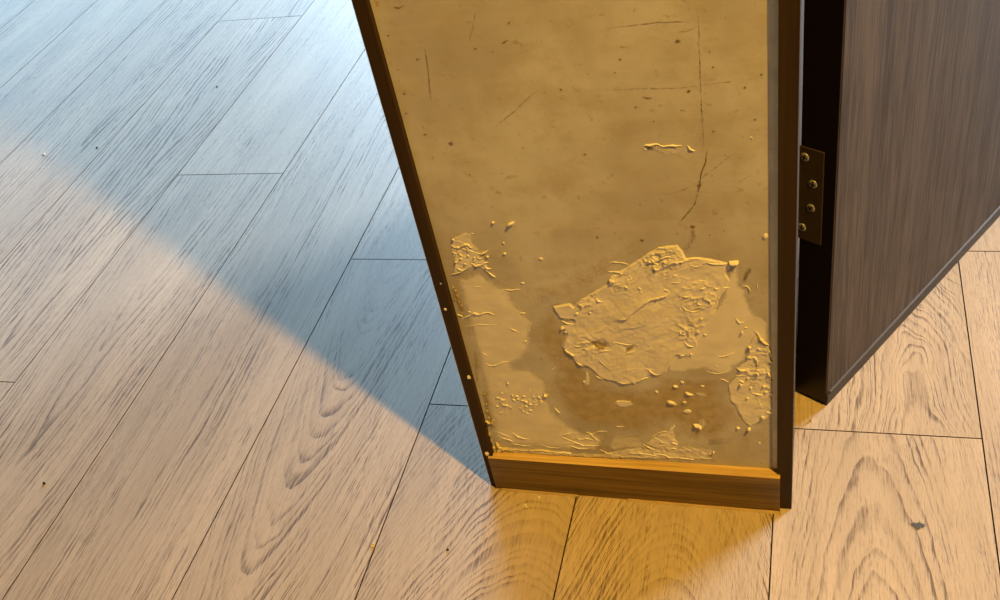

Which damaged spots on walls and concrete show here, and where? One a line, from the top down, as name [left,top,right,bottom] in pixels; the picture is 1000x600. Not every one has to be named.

crack [614,15,712,221]
peeling [643,143,695,155]
peeling [451,232,495,277]
water stain [518,255,772,458]